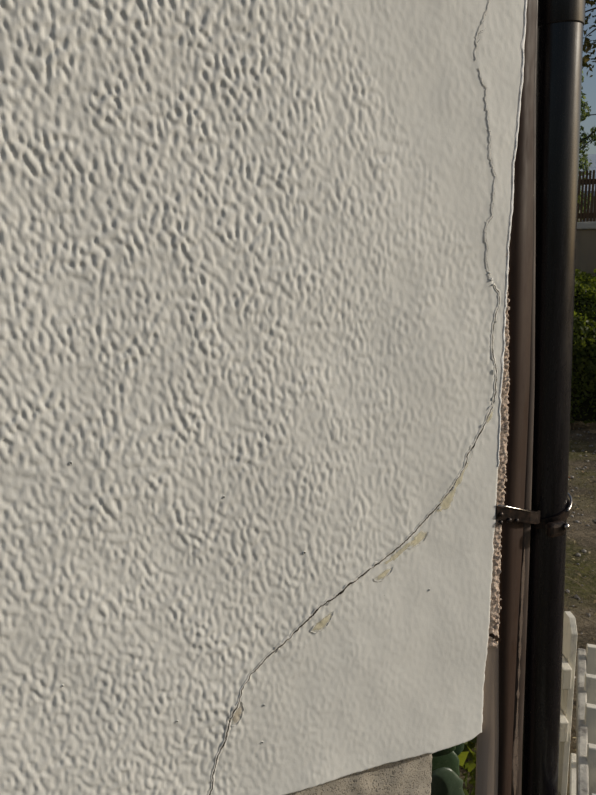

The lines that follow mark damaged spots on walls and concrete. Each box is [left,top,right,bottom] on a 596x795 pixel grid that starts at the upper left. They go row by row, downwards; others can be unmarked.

crack [207,0,501,795]